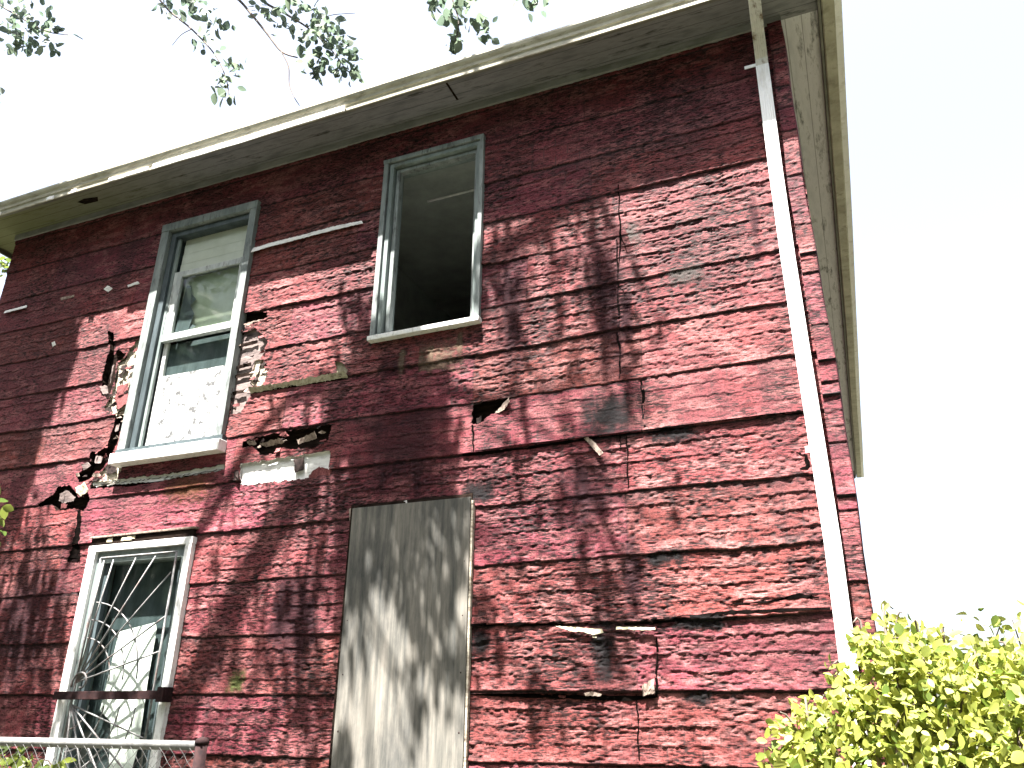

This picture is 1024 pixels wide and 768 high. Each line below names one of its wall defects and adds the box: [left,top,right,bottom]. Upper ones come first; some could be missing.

peeling [59,348,138,509]
peeling [230,319,267,410]
peeling [242,425,332,478]
crack [616,184,645,489]